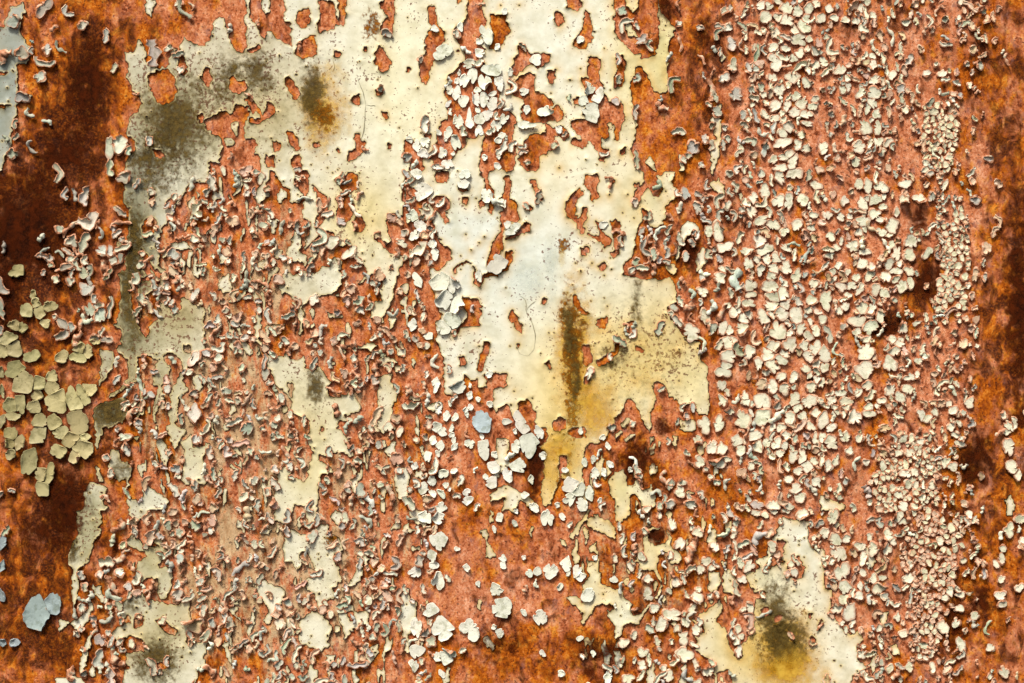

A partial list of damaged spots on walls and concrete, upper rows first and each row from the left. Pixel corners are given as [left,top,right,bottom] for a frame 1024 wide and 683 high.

rust [656,0,672,20]
rust [0,33,111,342]
peeling [0,0,569,683]
peeling [521,0,1024,683]
rust [1005,198,1024,426]
rust [615,435,657,475]
rust [655,418,670,434]
rust [959,436,993,489]
rust [17,469,88,548]
rust [648,530,664,544]
rust [933,587,990,654]
rust [572,637,624,677]